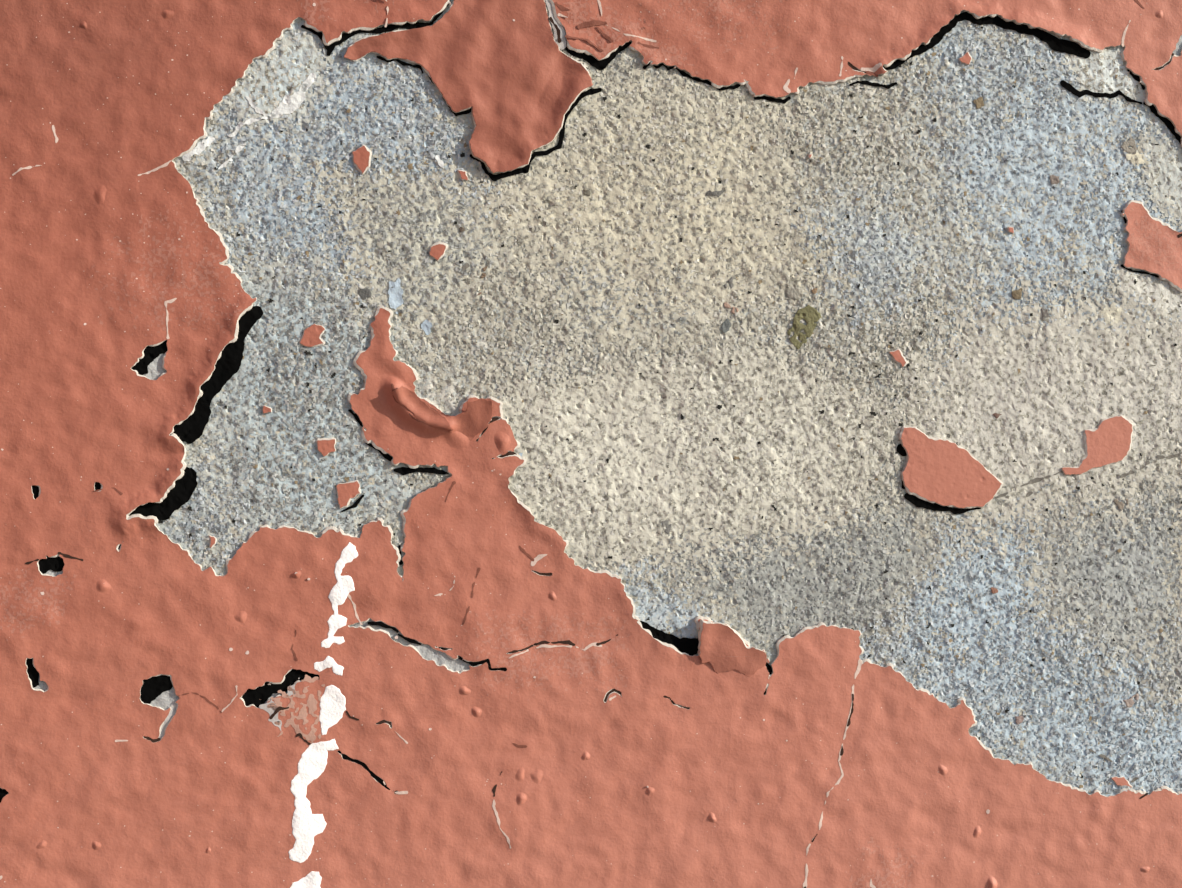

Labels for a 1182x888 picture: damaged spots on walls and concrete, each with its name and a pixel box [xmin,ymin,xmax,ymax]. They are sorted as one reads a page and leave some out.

spalling [131,340,168,380]
spalling [1070,298,1136,414]
spalling [37,554,65,577]
spalling [348,618,505,674]
crack [348,594,618,671]
spalling [26,658,49,692]
spalling [140,674,179,743]
spalling [240,669,320,708]
crack [270,706,311,745]
crack [346,711,408,744]
crack [338,750,408,794]
crack [803,659,862,888]